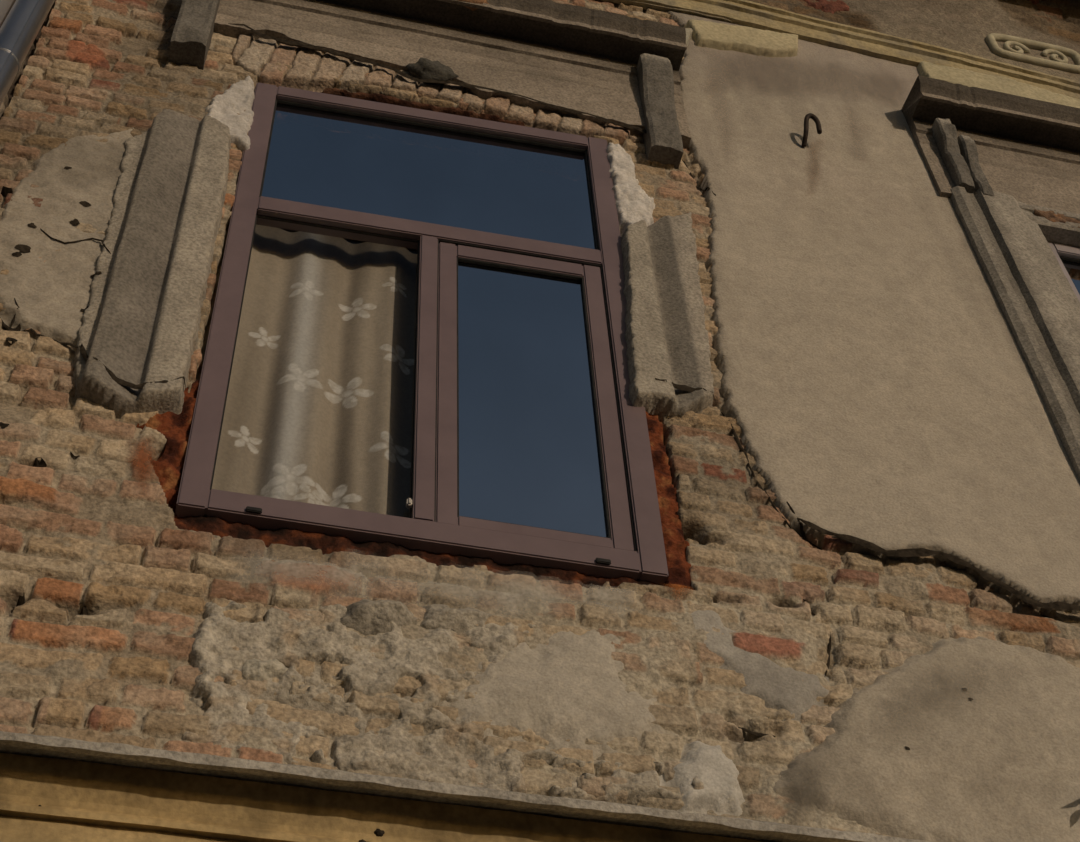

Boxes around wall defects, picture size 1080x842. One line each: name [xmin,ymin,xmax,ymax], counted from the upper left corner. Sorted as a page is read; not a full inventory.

spalling [12,244,31,257]
crack [40,228,111,254]
crack [1,298,186,389]
crack [655,378,1080,622]
crack [803,599,831,676]
spalling [181,600,704,805]
crack [727,721,776,737]